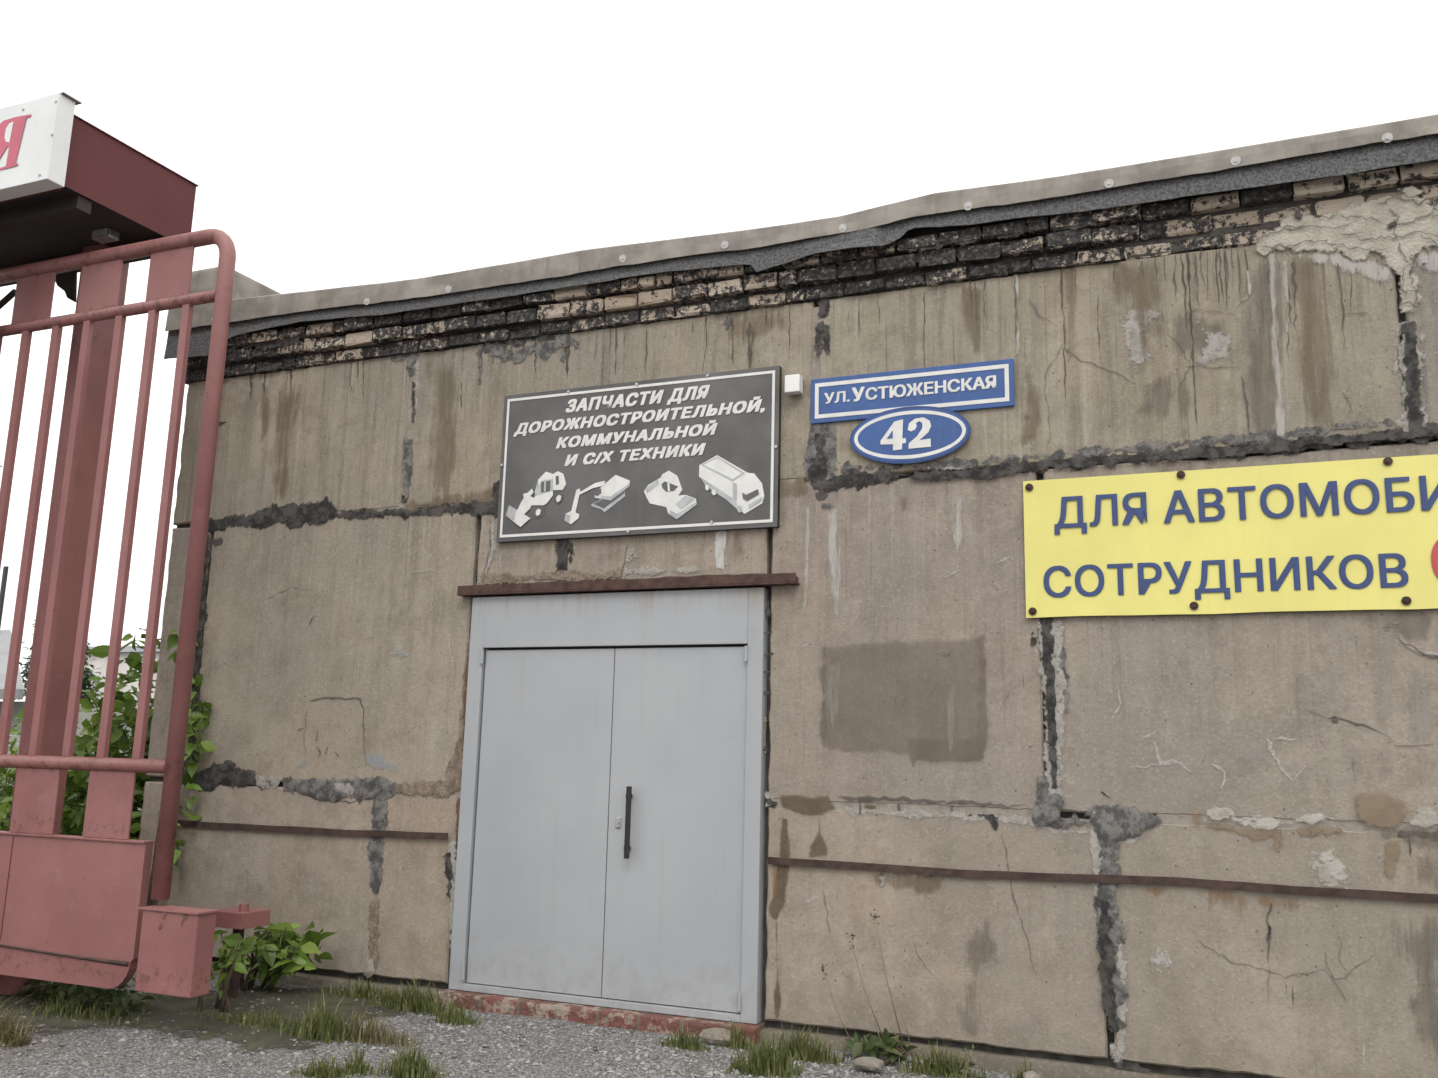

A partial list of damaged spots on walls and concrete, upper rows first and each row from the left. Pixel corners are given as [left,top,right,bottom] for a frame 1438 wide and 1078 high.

peeling [1248,186,1438,313]
leakage [676,216,1141,405]
leakage [780,247,1438,614]
peeling [1054,647,1070,712]
crack [1394,633,1438,659]
peeling [334,783,354,795]
crack [1266,903,1294,1007]
spalling [1110,1042,1151,1073]